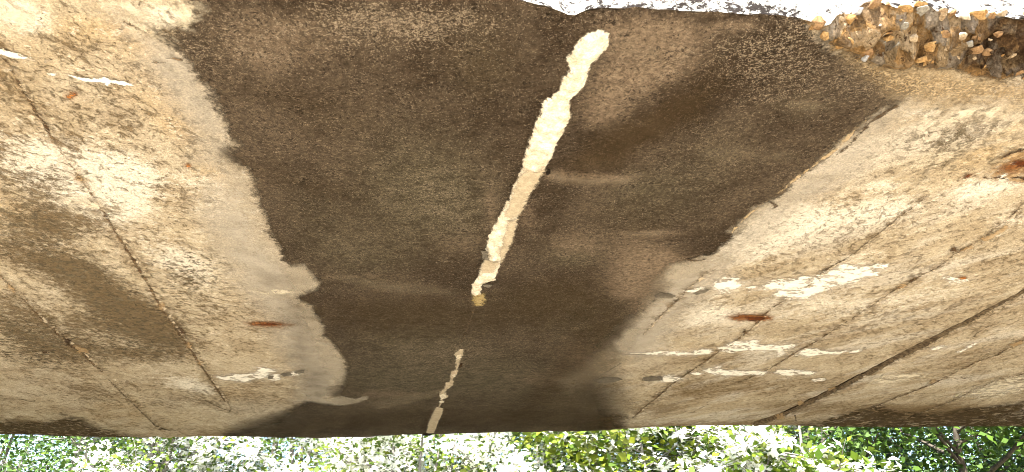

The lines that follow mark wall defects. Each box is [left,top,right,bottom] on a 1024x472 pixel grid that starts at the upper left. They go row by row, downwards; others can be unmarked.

spalling [802,0,1024,122]
damp [152,0,907,438]
rust [729,314,772,322]